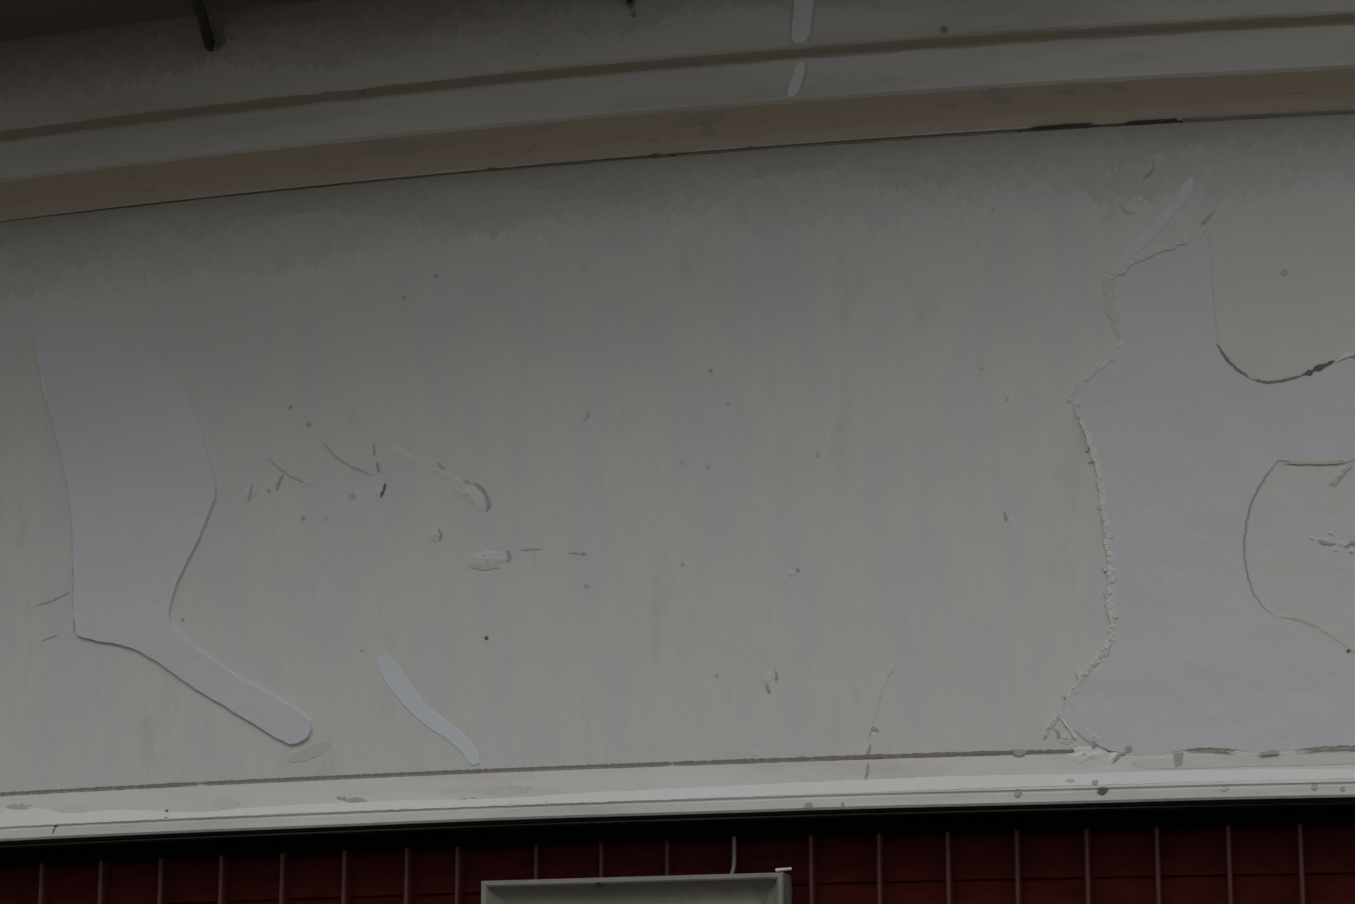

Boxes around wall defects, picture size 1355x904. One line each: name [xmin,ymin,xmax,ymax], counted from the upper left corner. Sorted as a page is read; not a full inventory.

spalling [1209,190,1355,381]